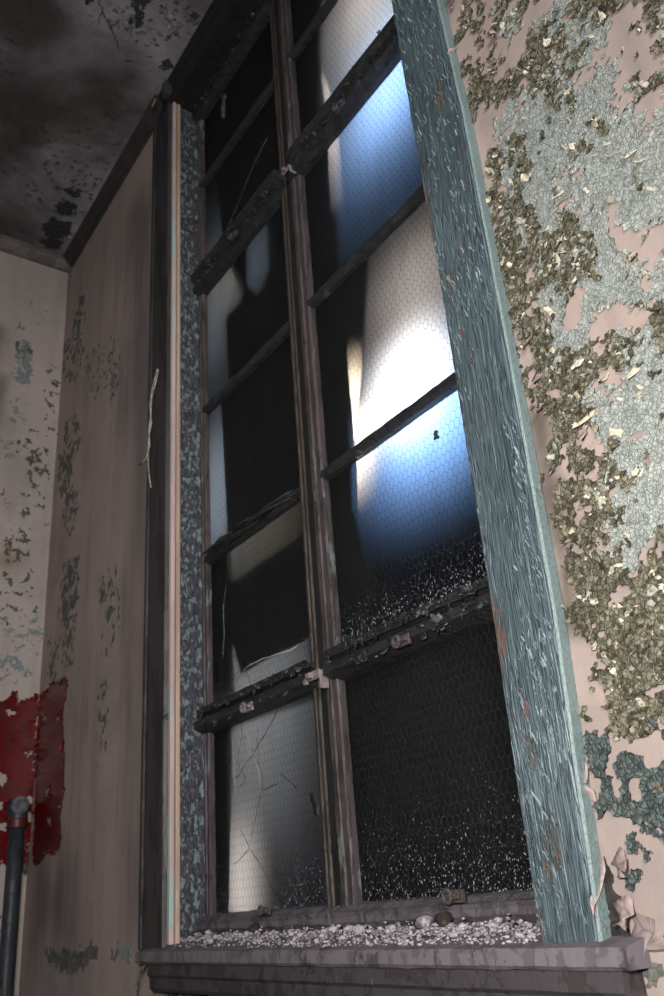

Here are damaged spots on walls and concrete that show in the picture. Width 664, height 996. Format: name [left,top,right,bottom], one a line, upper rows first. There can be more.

spalling [0,291,120,699]
peeling [447,0,664,989]